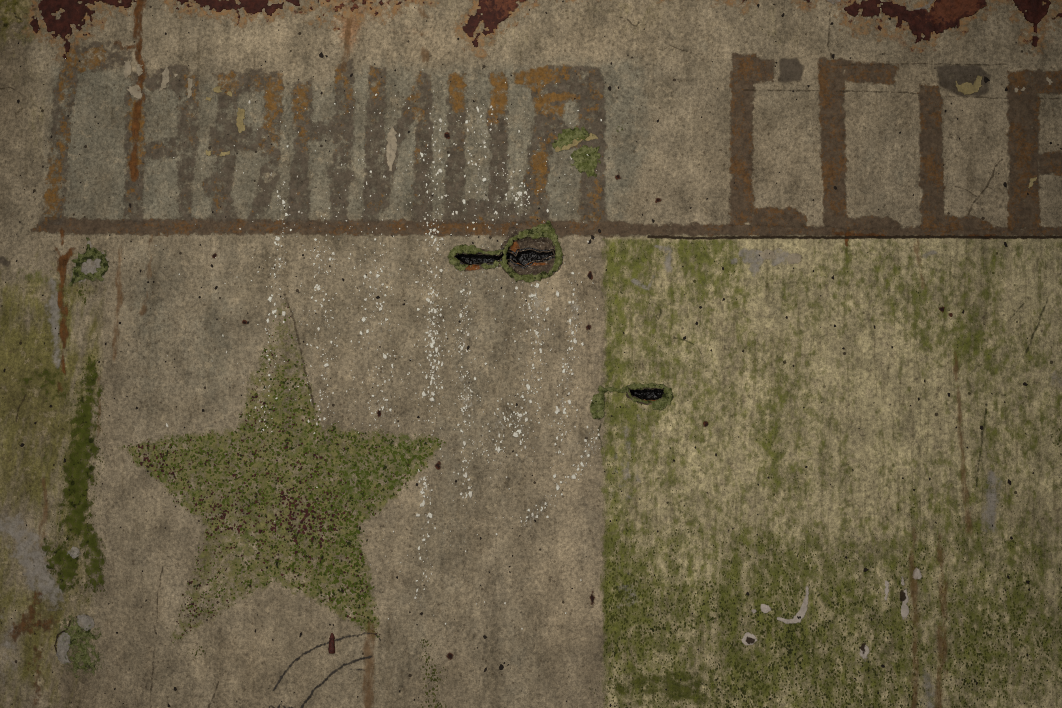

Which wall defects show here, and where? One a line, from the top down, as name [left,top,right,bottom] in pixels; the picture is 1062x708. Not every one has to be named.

peeling [18,0,137,62]
corrosion [114,0,146,182]
damp [420,105,530,229]
peeling [715,0,1062,57]
corrosion [56,228,74,390]
damp [255,182,292,432]
damp [301,234,337,434]
damp [359,254,399,424]
spalling [443,207,564,319]
damp [418,211,600,524]
spalling [590,332,689,420]